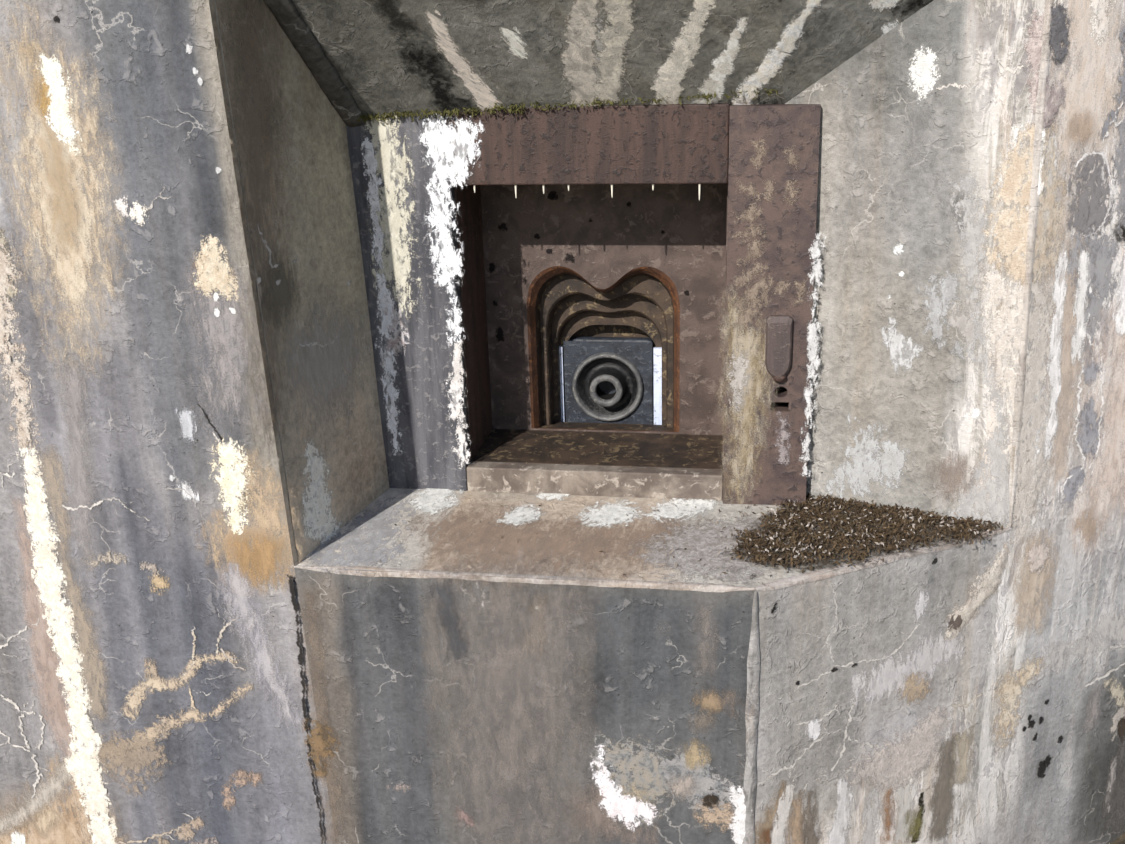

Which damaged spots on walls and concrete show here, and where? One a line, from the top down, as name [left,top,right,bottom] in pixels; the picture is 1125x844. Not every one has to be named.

damp [373,0,503,111]
damp [650,0,823,105]
damp [908,46,981,101]
spalling [1024,0,1070,128]
peeling [361,114,484,469]
rust [527,233,690,432]
rust [721,289,791,504]
peeling [1059,24,1125,507]
crack [0,694,48,804]
crack [90,609,252,795]
crack [287,575,325,844]
spalling [574,732,752,844]